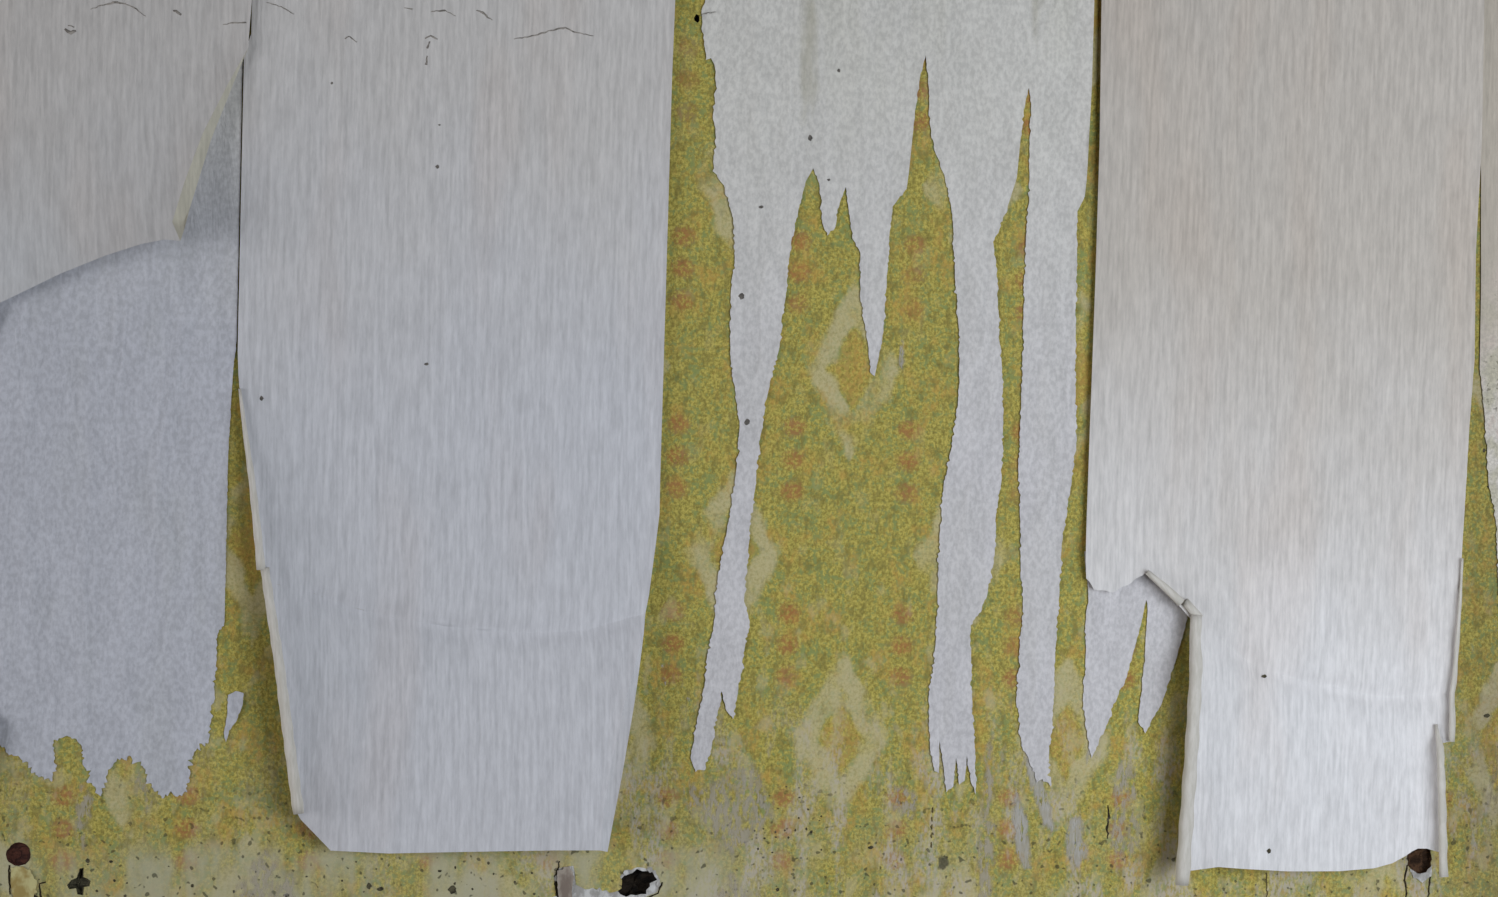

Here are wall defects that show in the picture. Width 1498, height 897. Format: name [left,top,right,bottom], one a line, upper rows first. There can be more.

peeling [0,0,675,897]
peeling [1086,0,1498,886]